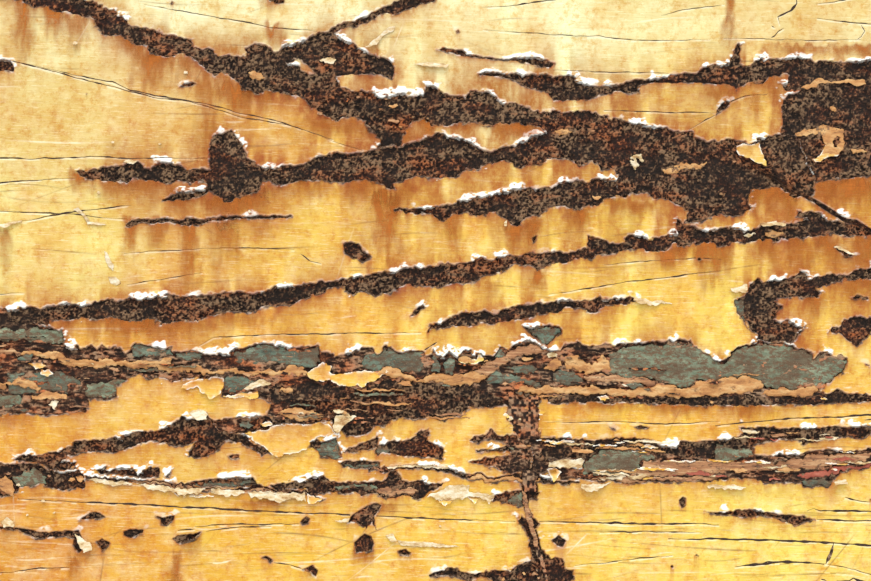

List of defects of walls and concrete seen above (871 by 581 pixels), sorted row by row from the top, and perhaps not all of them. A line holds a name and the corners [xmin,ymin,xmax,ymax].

peeling [0,61,14,72]
corrosion [483,43,871,201]
peeling [8,0,871,325]
corrosion [242,378,503,436]
peeling [0,268,871,581]
corrosion [547,390,871,415]
corrosion [539,426,871,461]
corrosion [0,463,85,496]
crack [26,499,350,516]
crack [376,514,498,522]
crack [808,508,871,522]
crack [539,521,871,581]